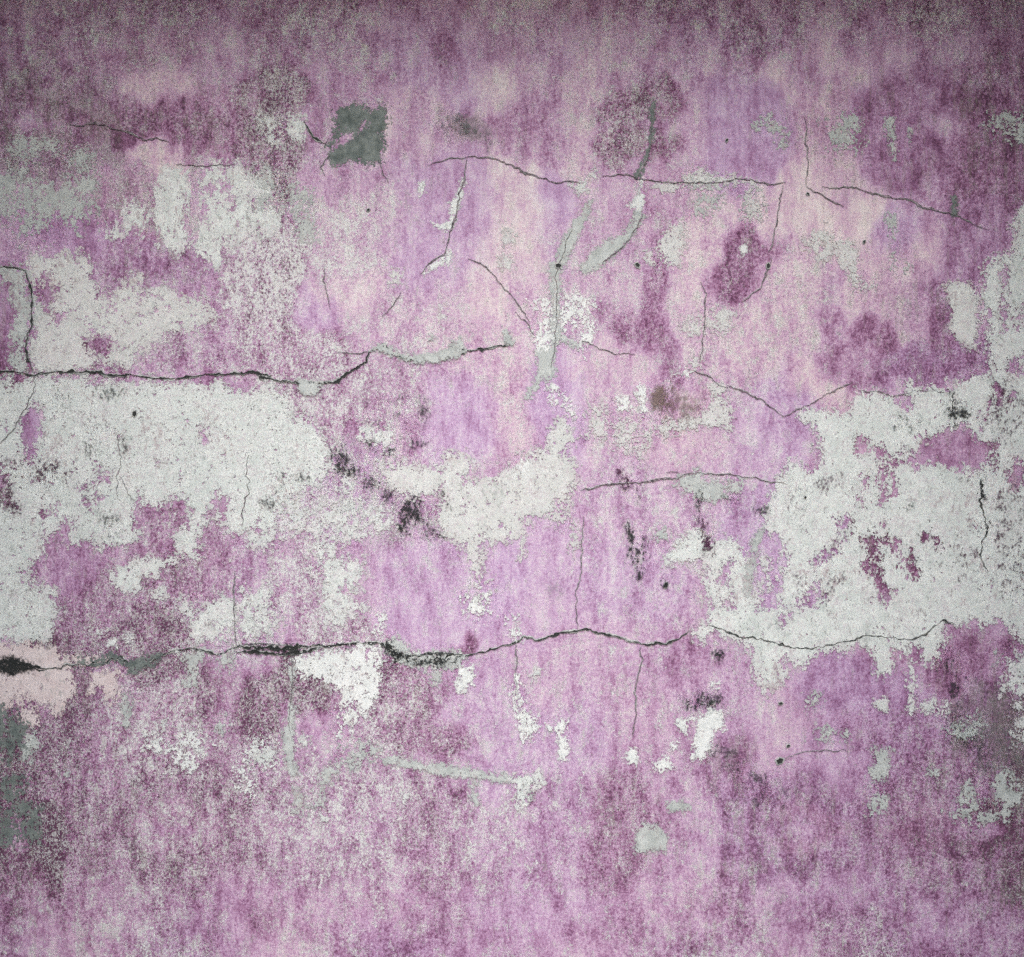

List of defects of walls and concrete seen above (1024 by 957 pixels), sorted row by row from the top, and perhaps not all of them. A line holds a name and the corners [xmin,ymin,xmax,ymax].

crack [70,122,232,167]
crack [0,265,508,443]
crack [304,121,330,175]
crack [422,155,648,400]
crack [606,98,986,301]
crack [688,284,953,417]
peeling [0,100,748,859]
crack [580,471,787,491]
peeling [653,195,1024,835]
crack [0,517,954,776]